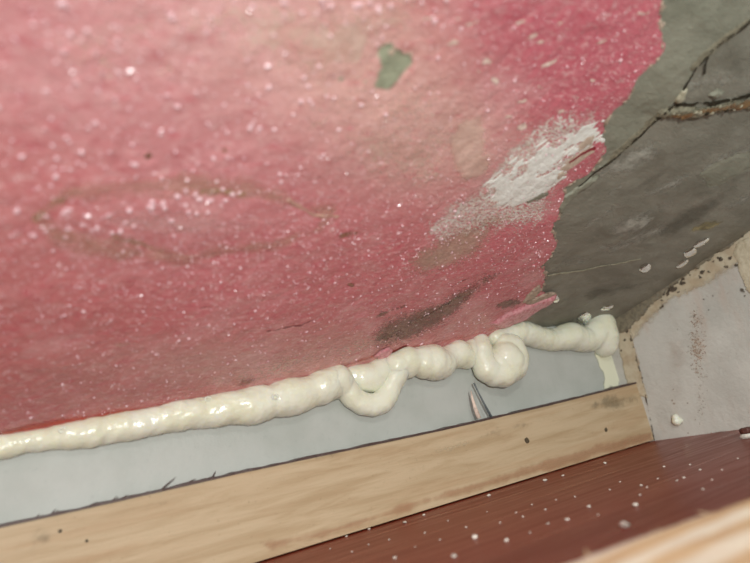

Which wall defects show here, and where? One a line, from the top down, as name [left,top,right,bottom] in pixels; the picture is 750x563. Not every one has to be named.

peeling [374,42,413,91]
spalling [428,0,750,254]
crack [578,20,750,187]
damp [372,273,499,349]
damp [660,273,690,309]